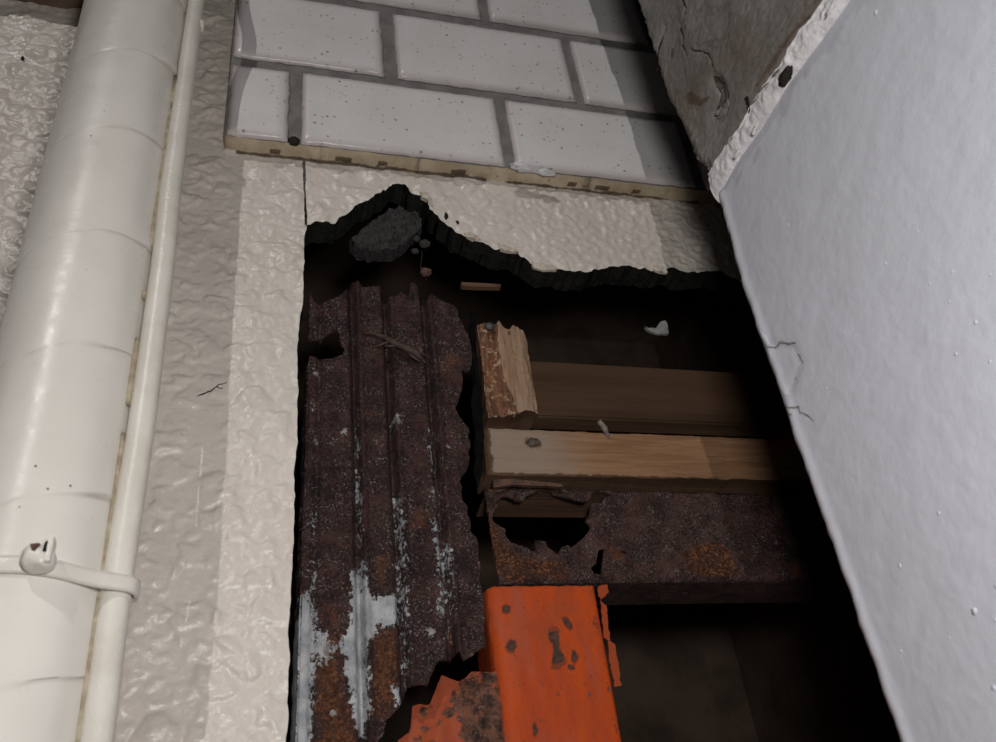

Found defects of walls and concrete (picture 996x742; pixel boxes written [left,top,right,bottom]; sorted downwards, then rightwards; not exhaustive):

crack [680,0,715,72]
spalling [297,184,750,380]
peeling [477,323,517,418]
peeling [760,331,800,396]
crack [766,341,804,381]
crack [786,405,814,420]
corrosion [492,479,563,490]
corrosion [506,640,517,656]
corrosion [548,617,579,670]
peeling [597,584,622,687]